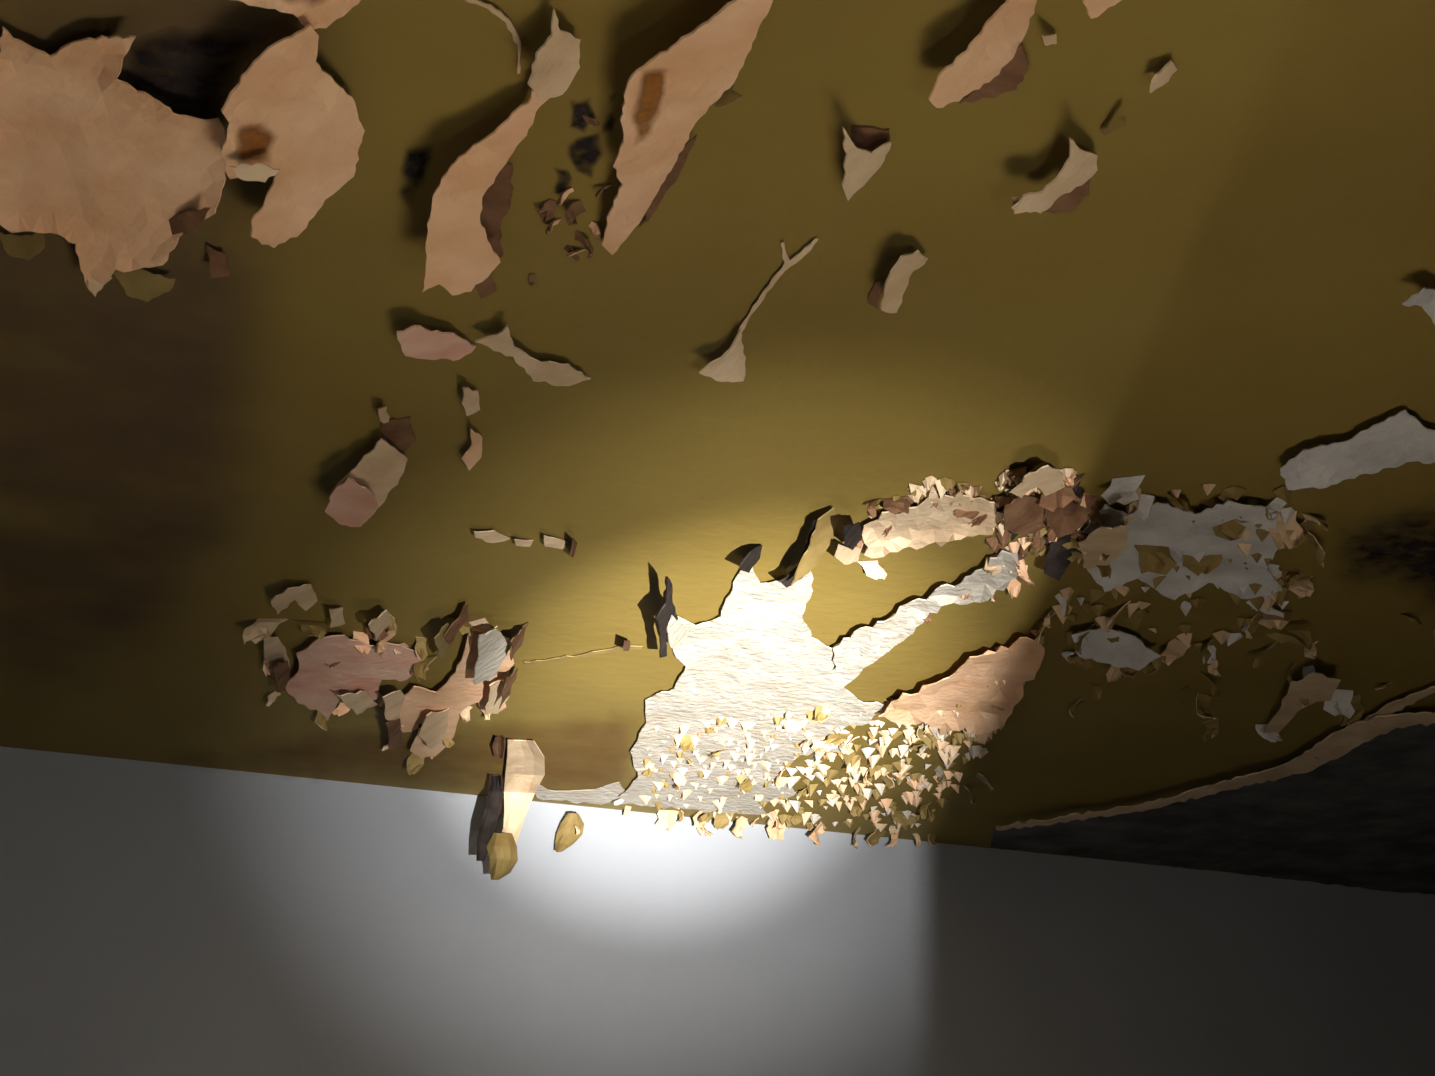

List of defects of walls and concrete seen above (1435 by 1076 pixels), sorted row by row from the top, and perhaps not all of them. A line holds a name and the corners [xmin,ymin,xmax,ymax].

peeling [928,0,1057,108]
peeling [0,0,365,302]
peeling [422,8,581,299]
peeling [537,0,773,262]
peeling [842,125,891,201]
peeling [1011,137,1098,214]
crack [738,238,818,333]
peeling [397,325,591,386]
peeling [699,329,746,382]
peeling [325,406,416,527]
peeling [242,584,529,775]
flaking render [474,410,1435,895]